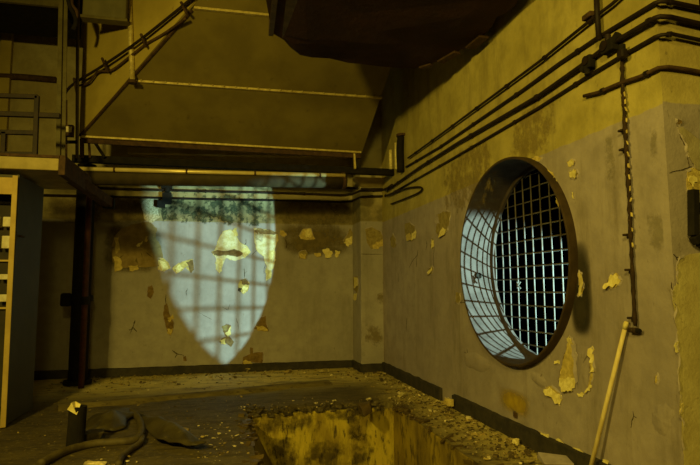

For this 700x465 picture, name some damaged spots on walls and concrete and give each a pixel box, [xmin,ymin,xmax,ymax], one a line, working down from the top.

leakage [162,189,271,226]
peeling [112,199,195,274]
peeling [212,228,287,281]
peeling [298,228,353,259]
peeling [603,272,623,290]
peeling [218,323,234,347]
peeling [543,335,596,407]
peeling [671,253,700,465]